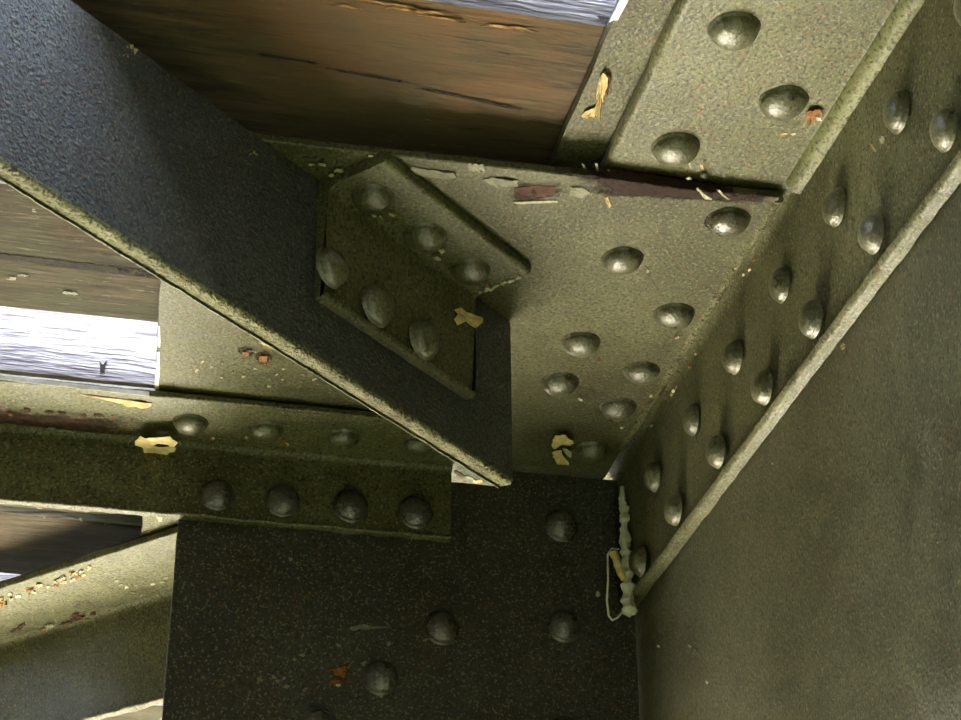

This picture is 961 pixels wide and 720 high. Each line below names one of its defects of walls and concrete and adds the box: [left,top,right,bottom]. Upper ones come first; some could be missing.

peeling [581,71,608,121]
peeling [410,166,457,180]
peeling [468,162,590,204]
peeling [454,307,483,328]
rust [239,342,272,366]
rust [0,408,119,436]
peeling [135,436,178,455]
peeling [551,435,574,465]